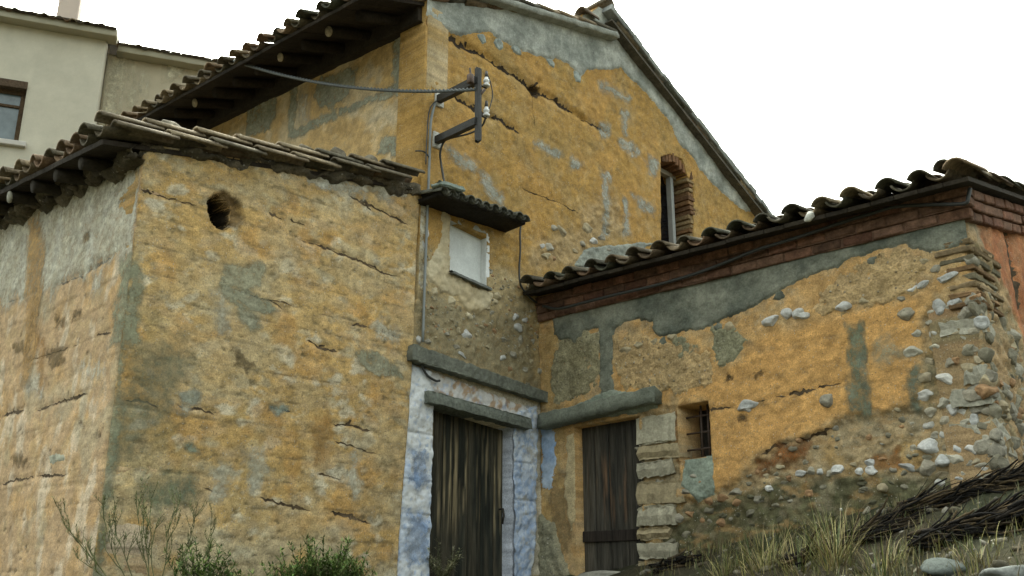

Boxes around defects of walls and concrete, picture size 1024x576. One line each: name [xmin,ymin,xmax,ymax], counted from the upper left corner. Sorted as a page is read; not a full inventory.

crack [448,35,604,133]
crack [141,189,197,206]
spalling [206,190,242,230]
crack [308,340,338,352]
water stain [846,322,896,415]
crack [4,393,86,416]
crack [758,383,841,402]
crack [334,420,374,453]
crack [3,473,66,486]
crack [261,497,368,523]